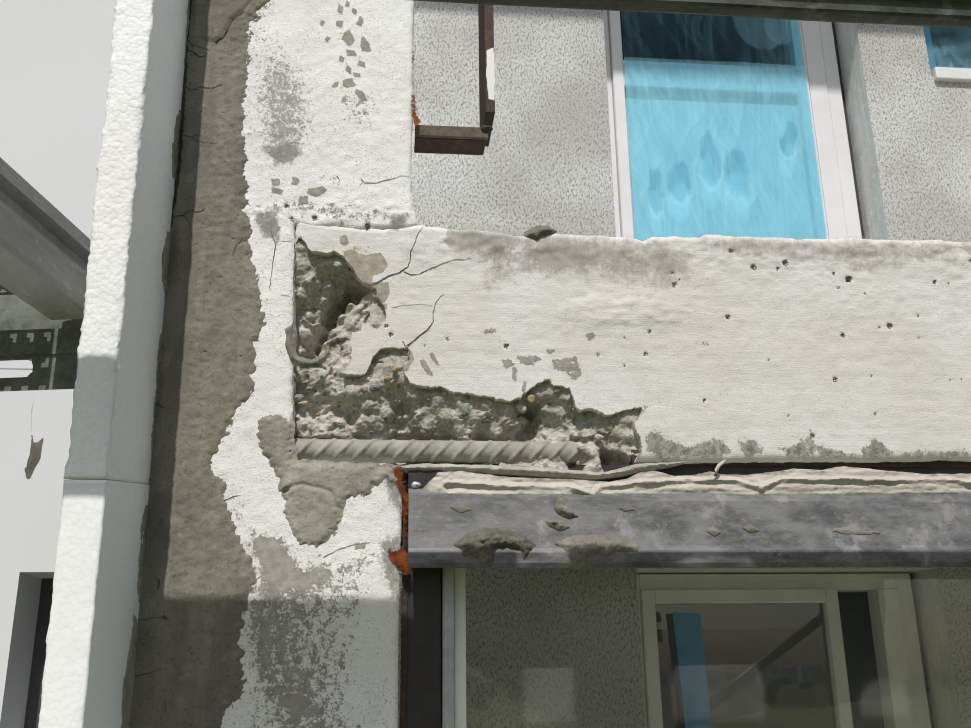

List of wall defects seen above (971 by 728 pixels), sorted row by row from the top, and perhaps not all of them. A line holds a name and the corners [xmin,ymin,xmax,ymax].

peeling [320,1,374,131]
peeling [255,175,409,239]
crack [368,227,470,287]
crack [397,294,444,360]
spalling [780,430,968,460]
corrosion [392,465,408,536]
spalling [222,235,763,728]
corrosion [388,548,412,575]